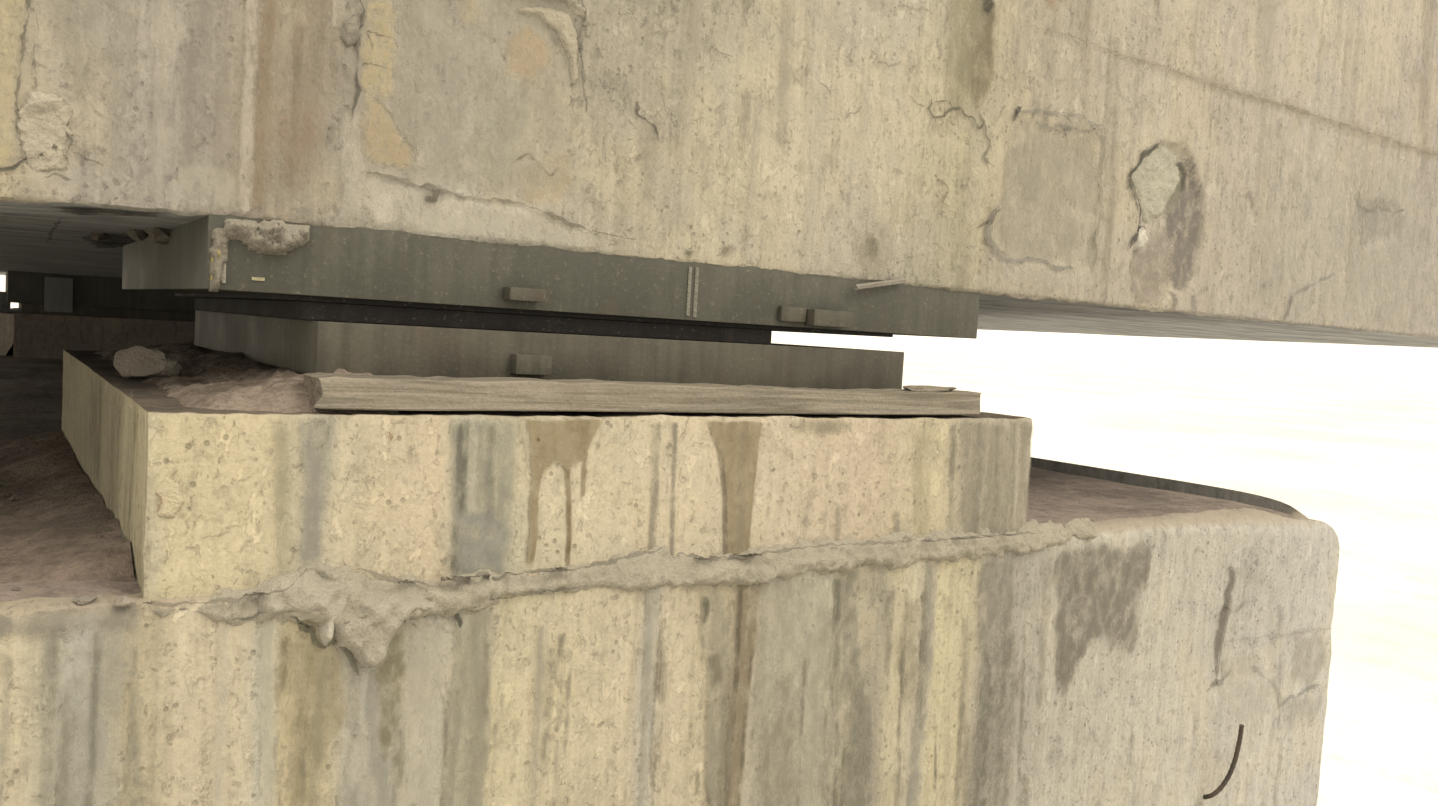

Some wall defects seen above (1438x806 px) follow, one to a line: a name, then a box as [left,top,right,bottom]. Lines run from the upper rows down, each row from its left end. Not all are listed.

crack [0,0,31,171]
peeling [339,0,635,240]
crack [928,99,994,167]
spalling [1128,144,1202,311]
damp [451,419,602,575]
damp [709,421,763,555]
damp [696,569,874,806]
damp [887,565,937,806]
damp [958,544,1152,806]